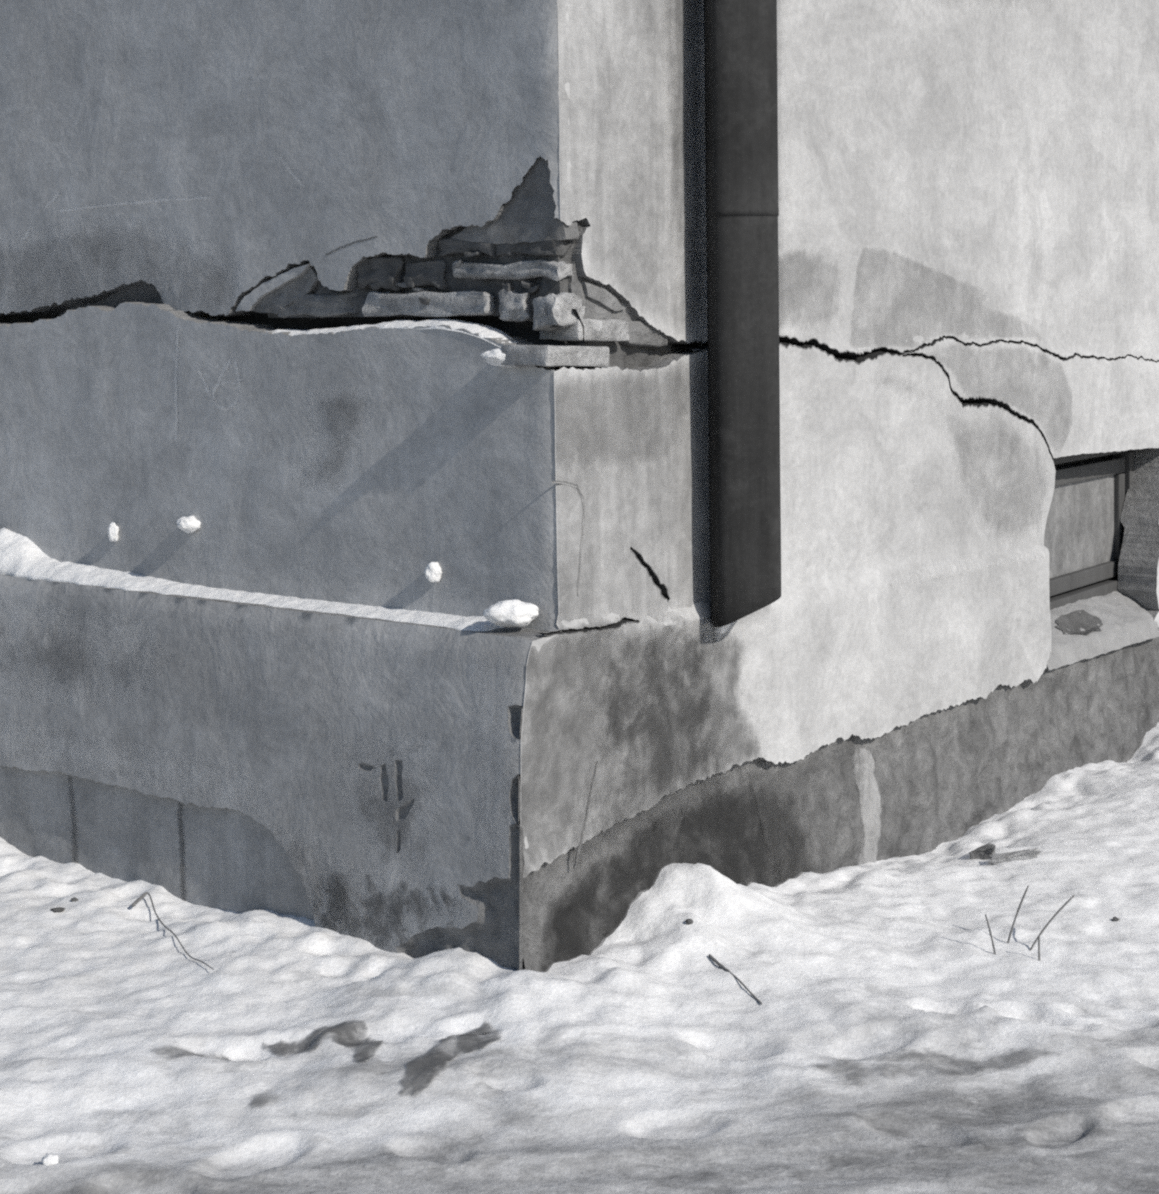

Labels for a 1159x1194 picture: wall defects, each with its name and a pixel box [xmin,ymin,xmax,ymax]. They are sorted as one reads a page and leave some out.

spalling [235,156,685,369]
crack [0,282,163,323]
crack [208,309,584,369]
crack [674,340,708,352]
crack [779,335,1159,460]
crack [552,481,585,597]
crack [630,547,670,601]
crack [539,617,640,636]
leakage [521,629,805,972]